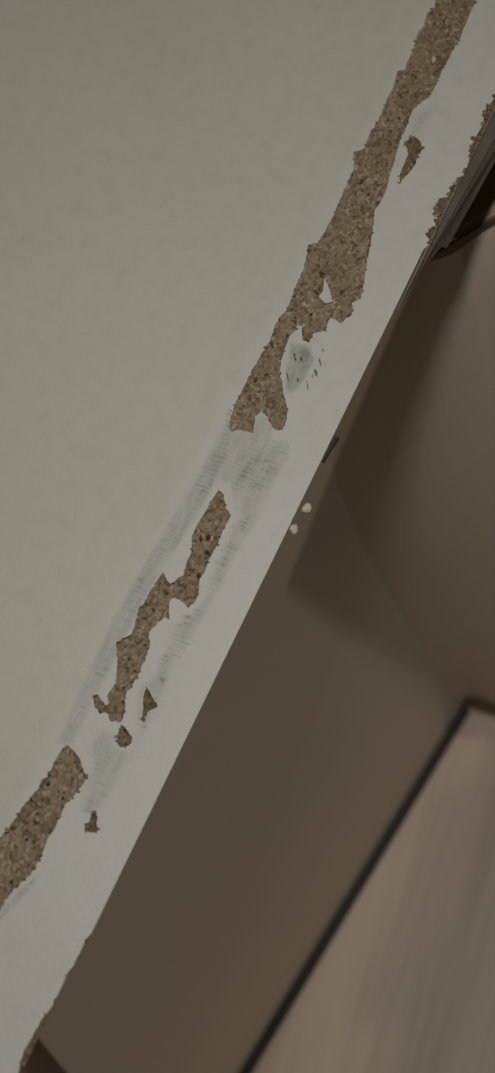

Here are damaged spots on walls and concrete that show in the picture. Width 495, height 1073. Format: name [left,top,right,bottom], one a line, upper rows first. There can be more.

peeling [229,0,477,433]
spalling [425,94,495,244]
peeling [93,492,231,748]
peeling [0,745,88,910]
peeling [84,810,100,833]